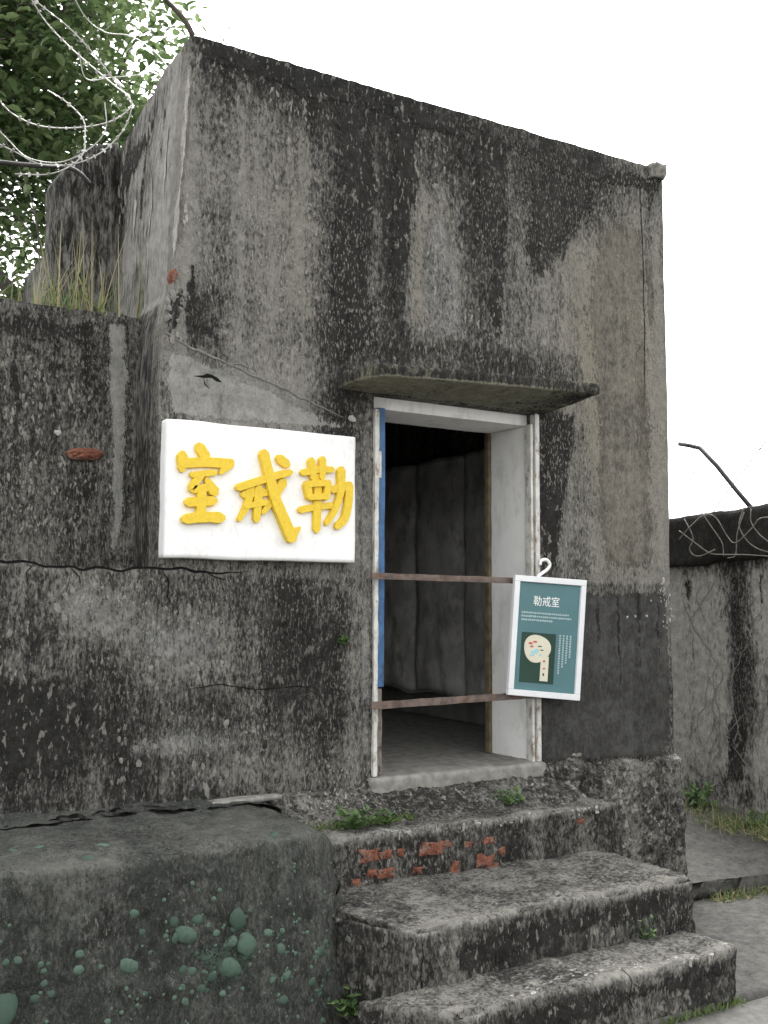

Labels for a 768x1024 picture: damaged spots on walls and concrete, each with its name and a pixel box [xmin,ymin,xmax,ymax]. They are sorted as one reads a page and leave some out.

damp [201,51,661,383]
damp [185,262,199,334]
crack [0,560,247,611]
crack [186,672,315,712]
damp [541,592,673,762]
damp [722,576,752,786]
spalling [351,847,405,886]
spalling [412,836,505,875]